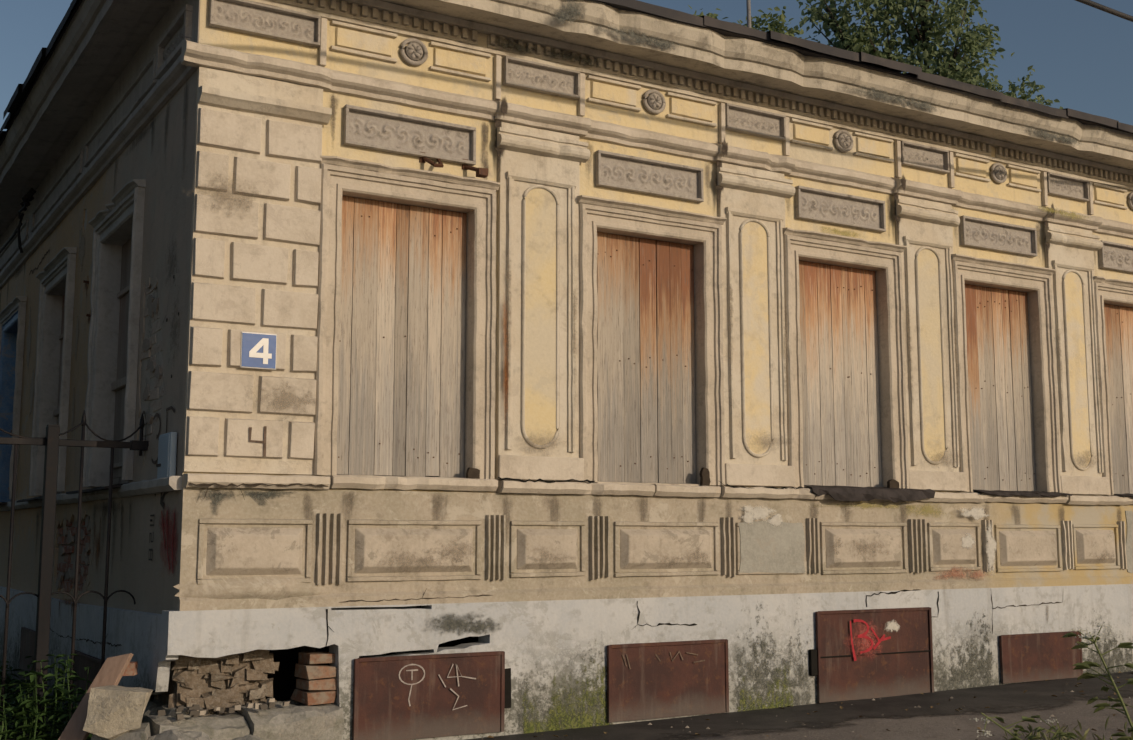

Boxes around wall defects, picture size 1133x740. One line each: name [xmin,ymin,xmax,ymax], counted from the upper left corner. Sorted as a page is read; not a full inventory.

flaking render [55,510,92,596]
peeling [742,505,782,526]
crack [326,588,492,646]
water stain [735,604,811,712]